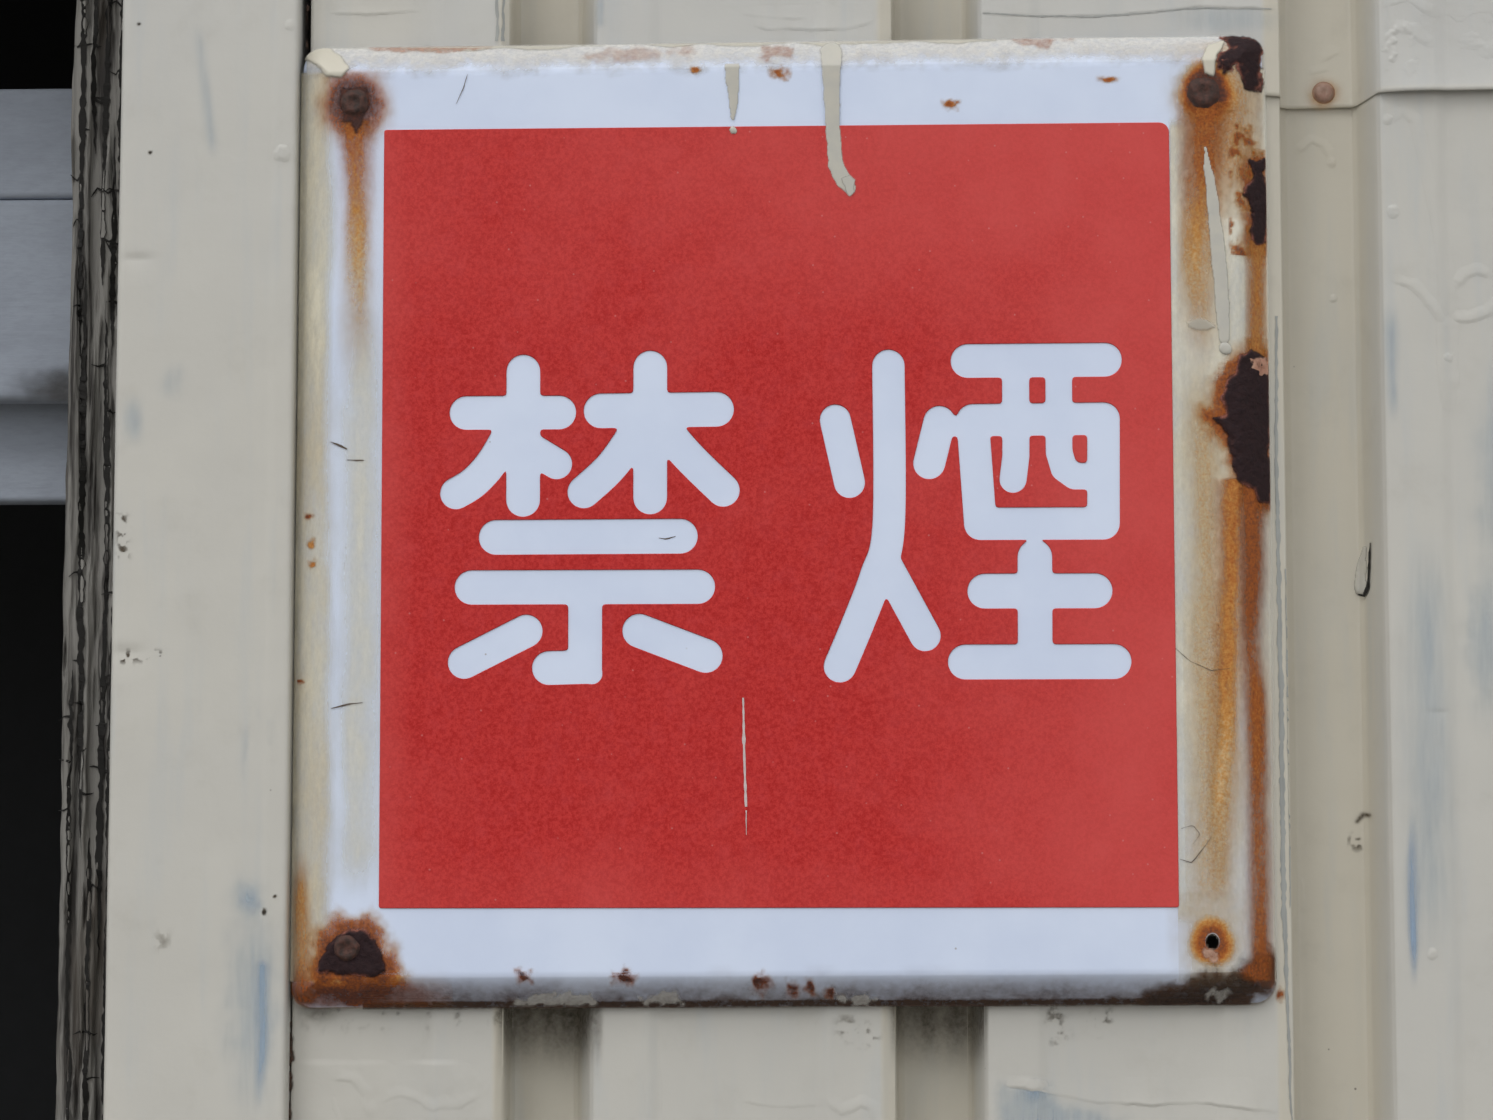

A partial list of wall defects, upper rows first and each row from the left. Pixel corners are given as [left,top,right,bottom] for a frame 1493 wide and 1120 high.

corrosion [323,73,386,312]
corrosion [1178,60,1263,312]
corrosion [344,337,375,864]
corrosion [1194,421,1224,891]
corrosion [293,879,1284,1009]